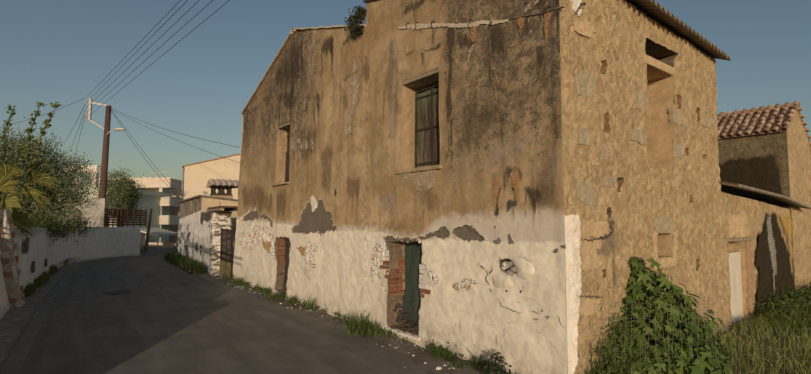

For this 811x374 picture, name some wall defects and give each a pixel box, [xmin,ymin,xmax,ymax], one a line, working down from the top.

water stain [432,27,473,156]
flaking render [243,207,273,227]
flaking render [292,196,338,236]
water stain [495,168,540,216]
flaking render [383,225,514,263]
crack [443,265,564,353]